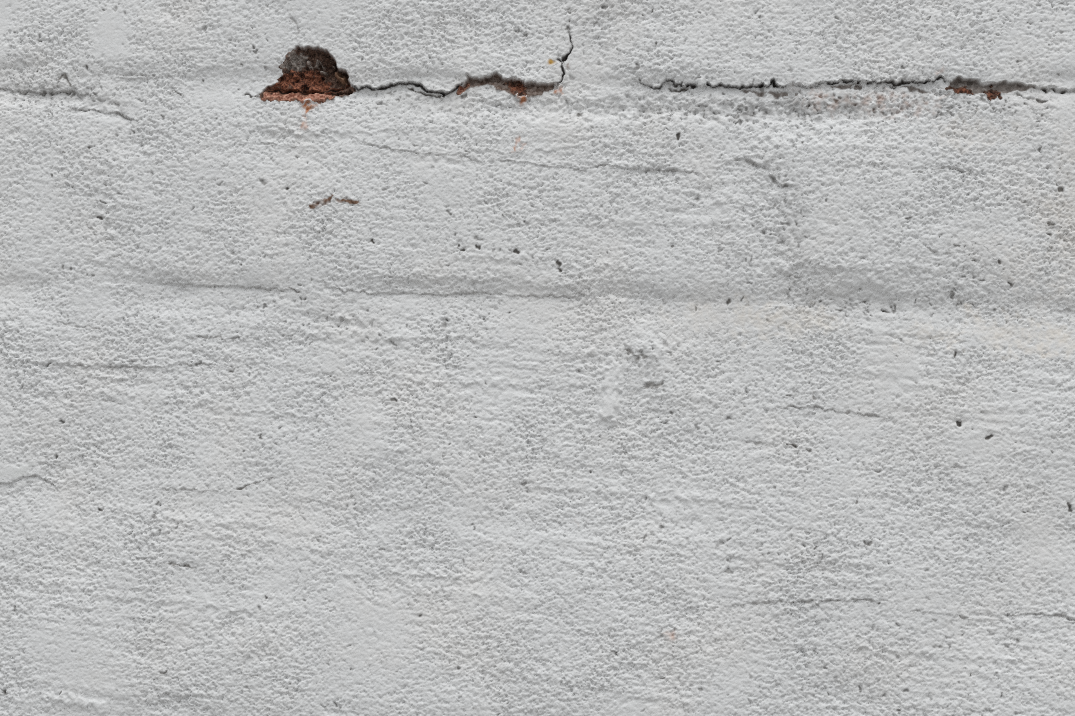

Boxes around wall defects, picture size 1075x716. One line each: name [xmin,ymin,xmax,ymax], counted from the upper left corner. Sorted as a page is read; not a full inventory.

spalling [243,44,358,104]
crack [350,81,464,99]
crack [640,75,949,100]